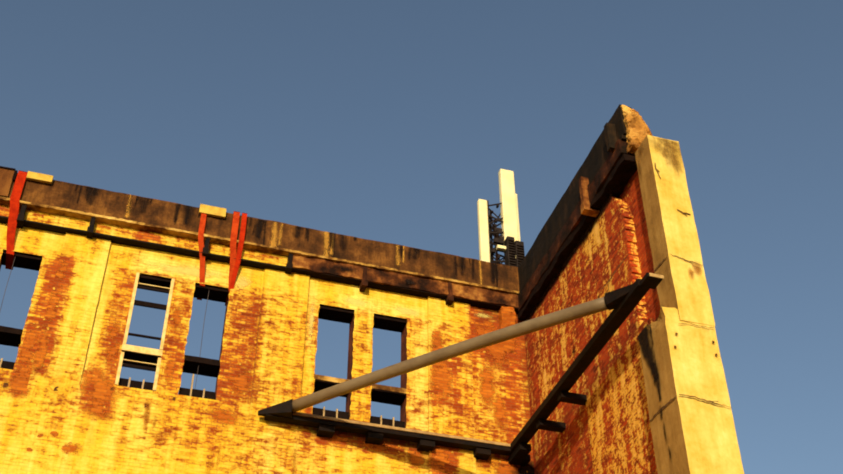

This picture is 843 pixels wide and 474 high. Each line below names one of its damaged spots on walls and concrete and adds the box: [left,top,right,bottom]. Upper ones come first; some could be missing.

peeling [3,261,67,396]
peeling [80,322,120,421]
peeling [479,338,519,427]
damp [637,324,662,416]
crack [650,394,732,421]